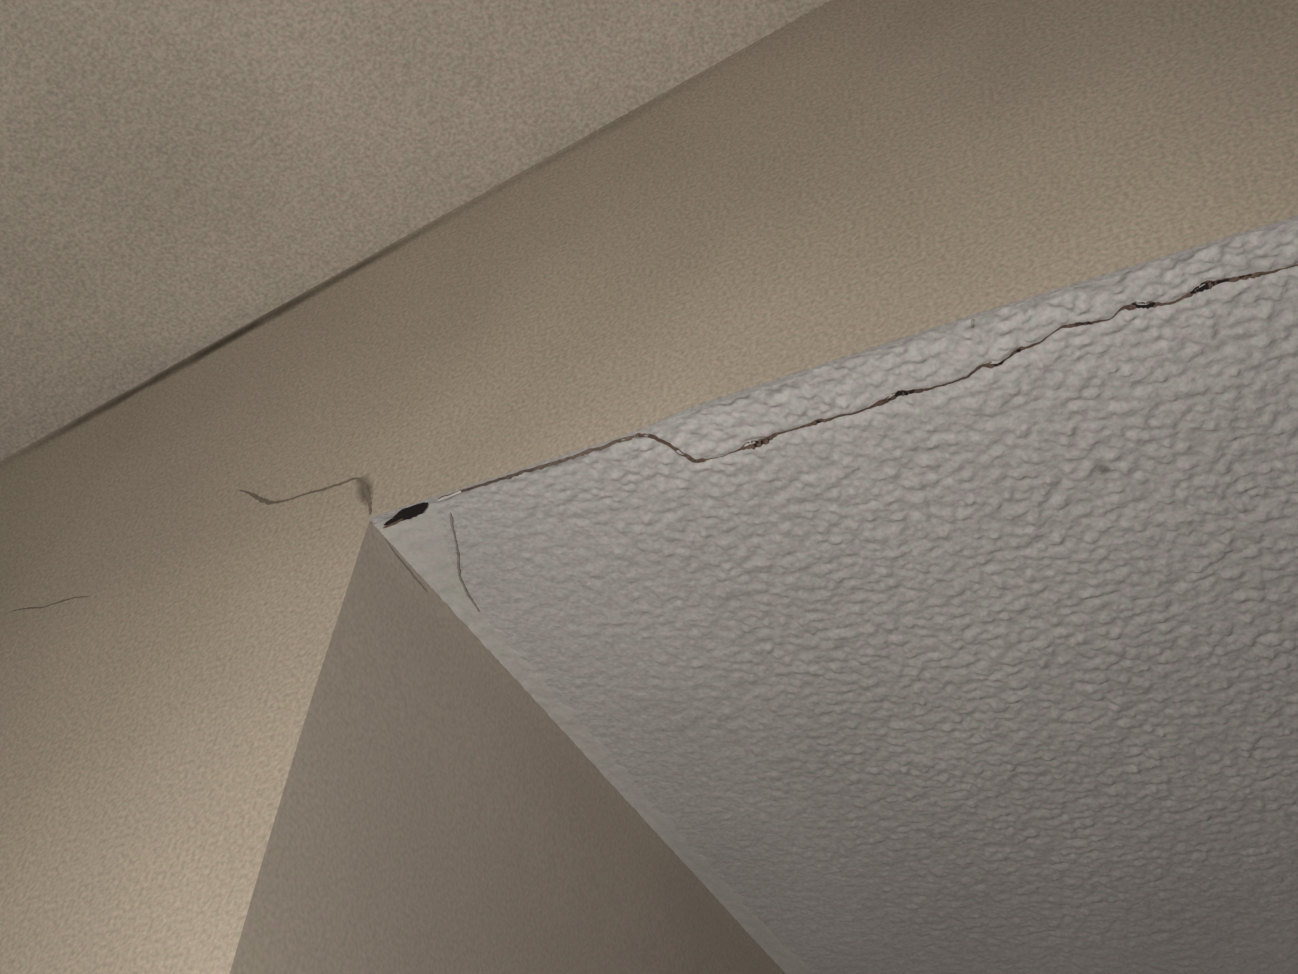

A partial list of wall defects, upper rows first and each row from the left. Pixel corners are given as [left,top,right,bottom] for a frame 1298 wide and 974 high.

crack [238,477,428,593]
crack [439,264,1298,612]